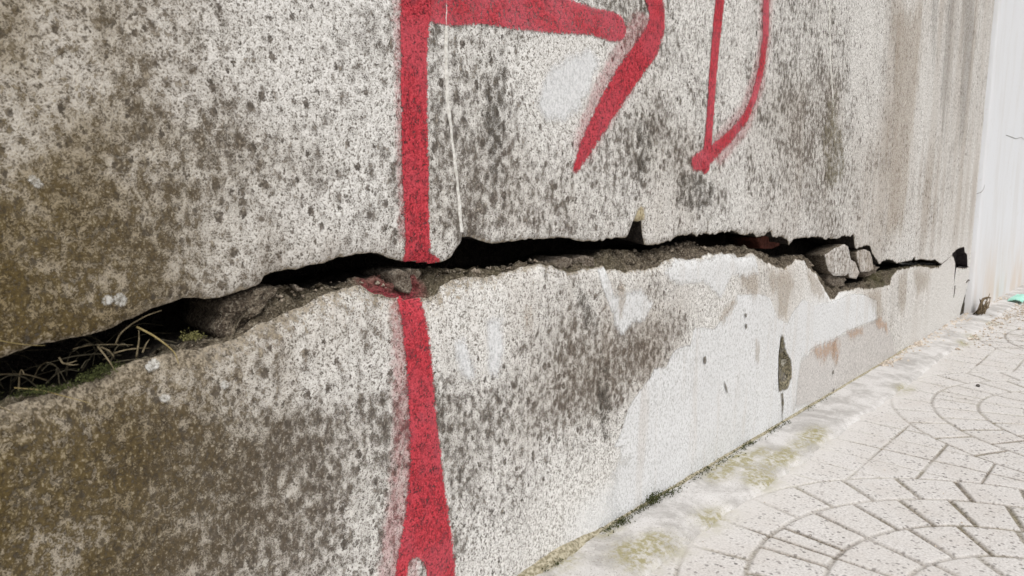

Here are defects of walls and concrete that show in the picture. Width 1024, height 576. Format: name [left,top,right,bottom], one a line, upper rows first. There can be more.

damp [822,85,847,186]
crack [0,221,950,409]
damp [577,289,598,336]
peeling [598,268,652,333]
peeling [665,254,758,296]
hole [951,247,970,295]
damp [595,351,615,438]
peeling [600,294,896,528]